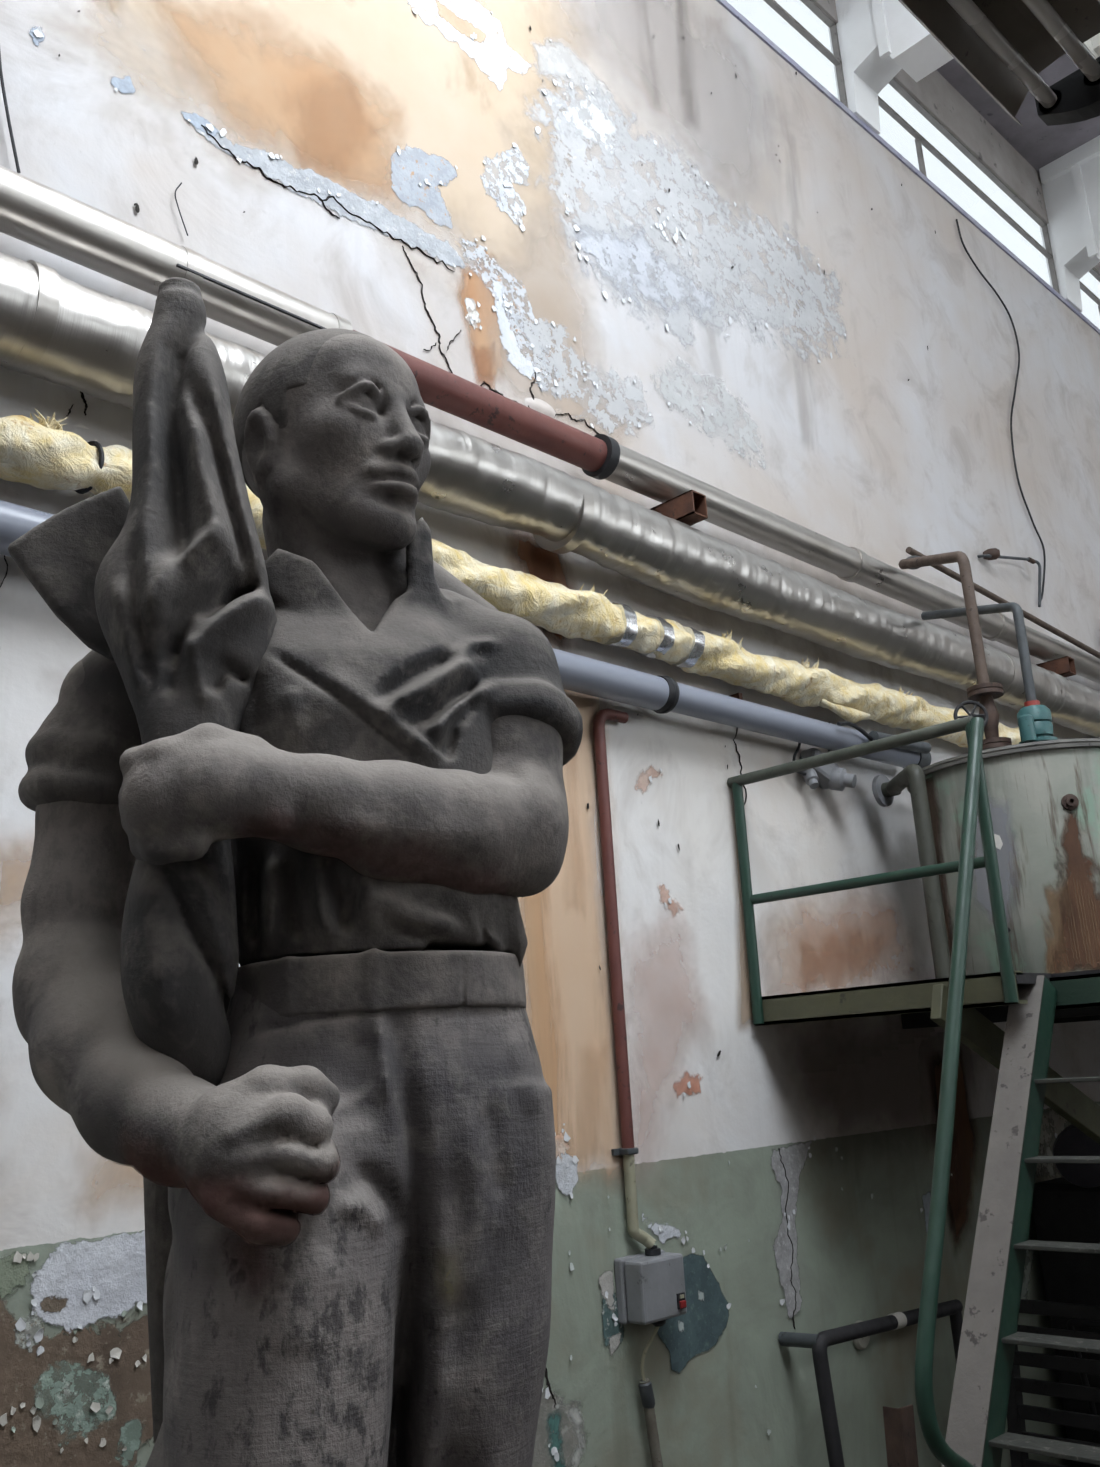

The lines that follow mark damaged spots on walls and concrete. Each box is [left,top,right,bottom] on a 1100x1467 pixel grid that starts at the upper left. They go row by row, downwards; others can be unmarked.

water stain [108,0,612,421]
peeling [181,111,653,436]
peeling [407,0,846,363]
peeling [0,1230,154,1467]
crack [545,1368,556,1408]
peeling [532,1387,585,1467]
peeling [555,1123,579,1199]
peeling [599,1271,624,1354]
peeling [642,1213,731,1373]
flaking render [673,1072,701,1098]
peeling [771,1136,816,1318]